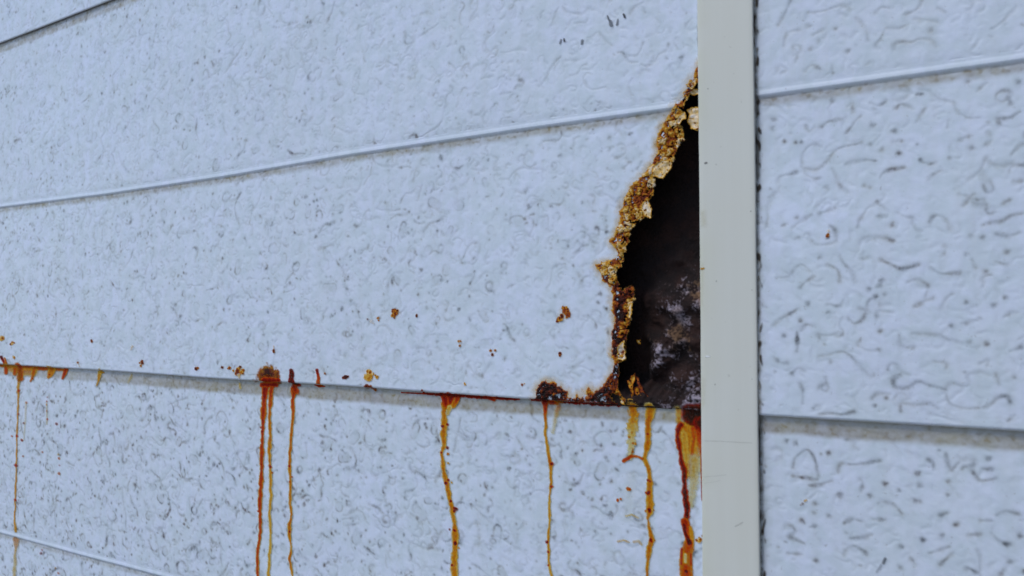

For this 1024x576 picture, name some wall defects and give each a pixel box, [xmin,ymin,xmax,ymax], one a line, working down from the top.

peeling [676,78,699,131]
peeling [651,159,672,179]
peeling [641,199,652,219]
corrosion [401,67,702,576]
peeling [617,340,641,361]
peeling [620,373,649,405]
corrosion [0,336,79,576]
corrosion [256,348,301,576]